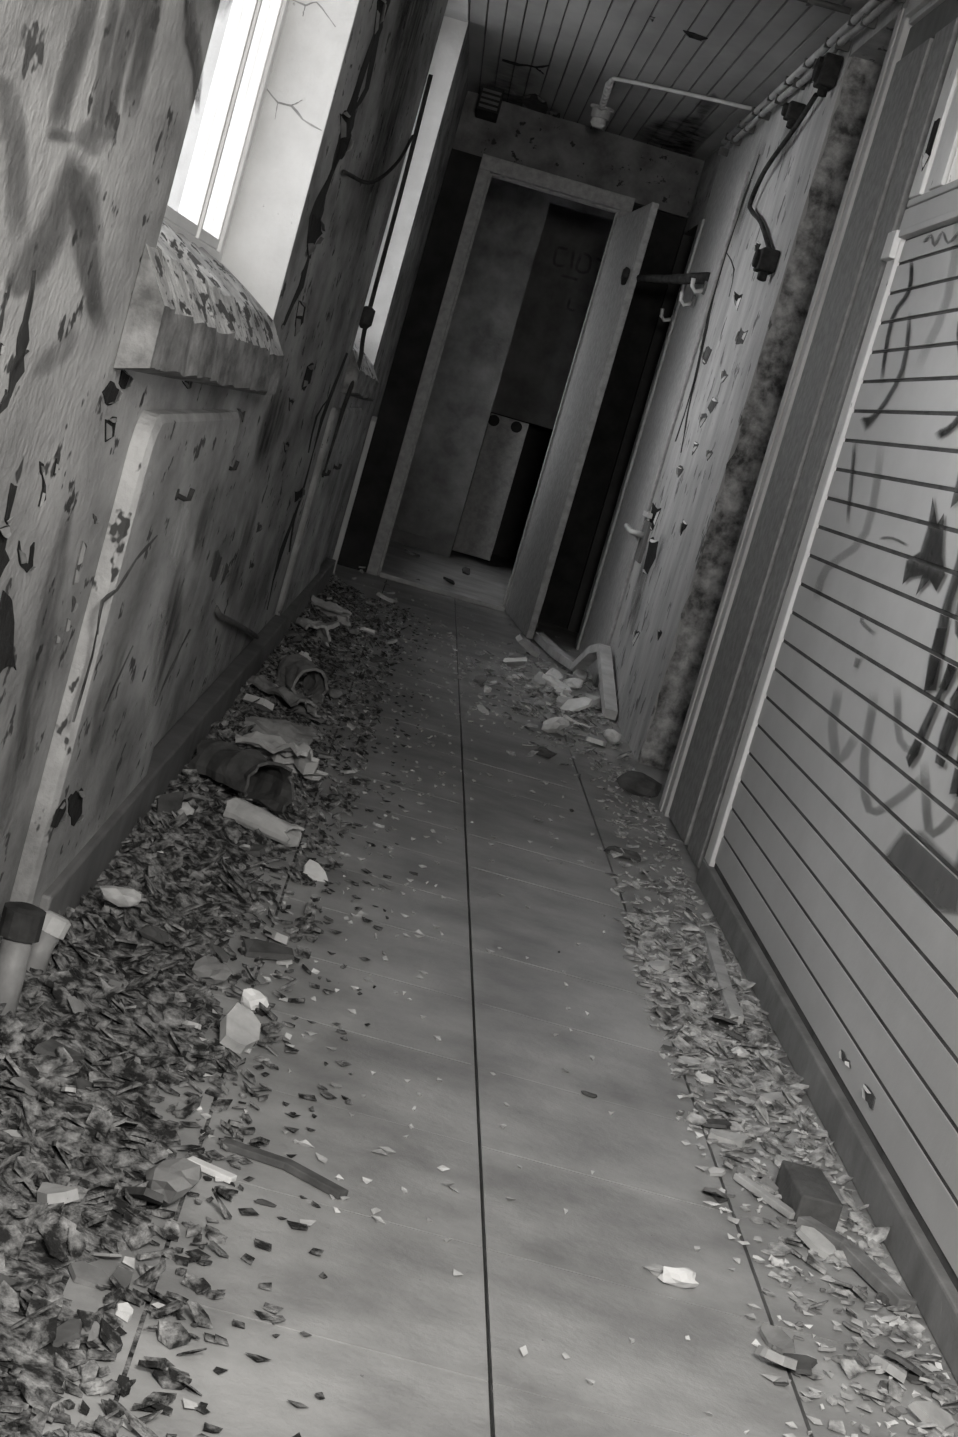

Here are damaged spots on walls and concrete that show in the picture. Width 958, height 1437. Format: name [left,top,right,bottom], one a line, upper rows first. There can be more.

peeling [102,370,133,442]
peeling [288,363,314,411]
peeling [38,458,60,507]
flaking render [0,483,36,673]
peeling [55,541,87,643]
peeling [209,550,230,585]
peeling [643,503,661,574]
flaking render [51,788,85,828]